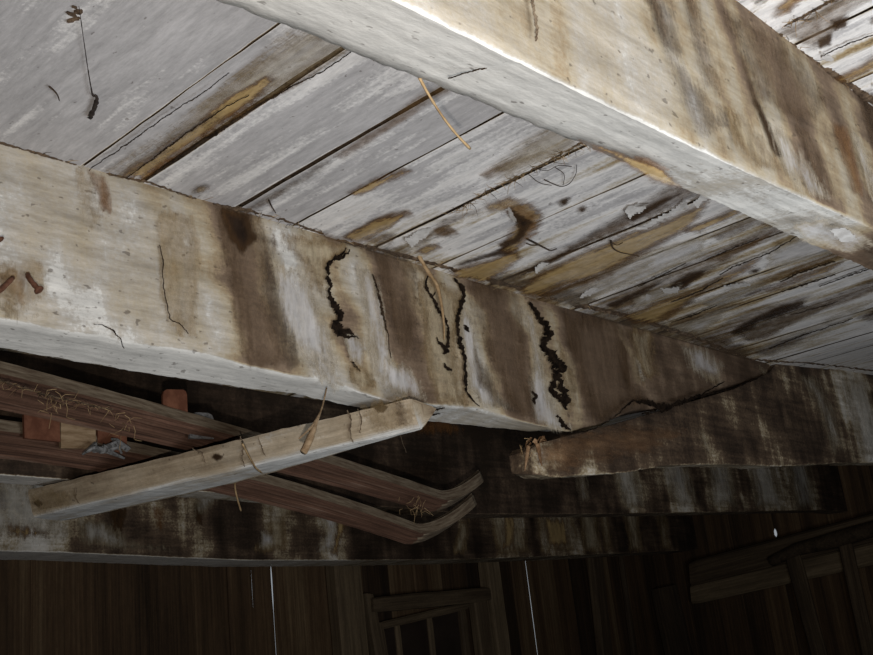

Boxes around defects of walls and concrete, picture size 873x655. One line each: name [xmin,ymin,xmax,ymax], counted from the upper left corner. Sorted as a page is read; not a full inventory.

leakage [651,0,680,54]
leakage [727,16,826,156]
leakage [776,0,801,16]
leakage [781,0,862,49]
leakage [838,60,873,82]
leakage [219,181,297,366]
crack [325,248,359,339]
crack [372,274,391,357]
crack [425,276,480,407]
crack [528,302,758,434]
leakage [452,145,873,416]
leakage [110,509,127,543]